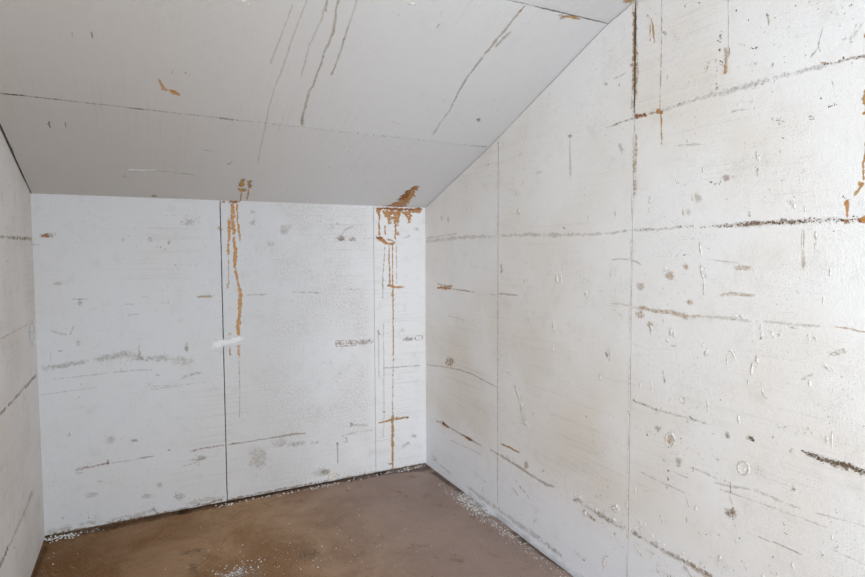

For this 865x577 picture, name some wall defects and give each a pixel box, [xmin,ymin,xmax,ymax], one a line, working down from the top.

rust [218,179,252,356]
rust [376,186,422,361]
rust [840,155,865,224]
rust [379,402,408,468]